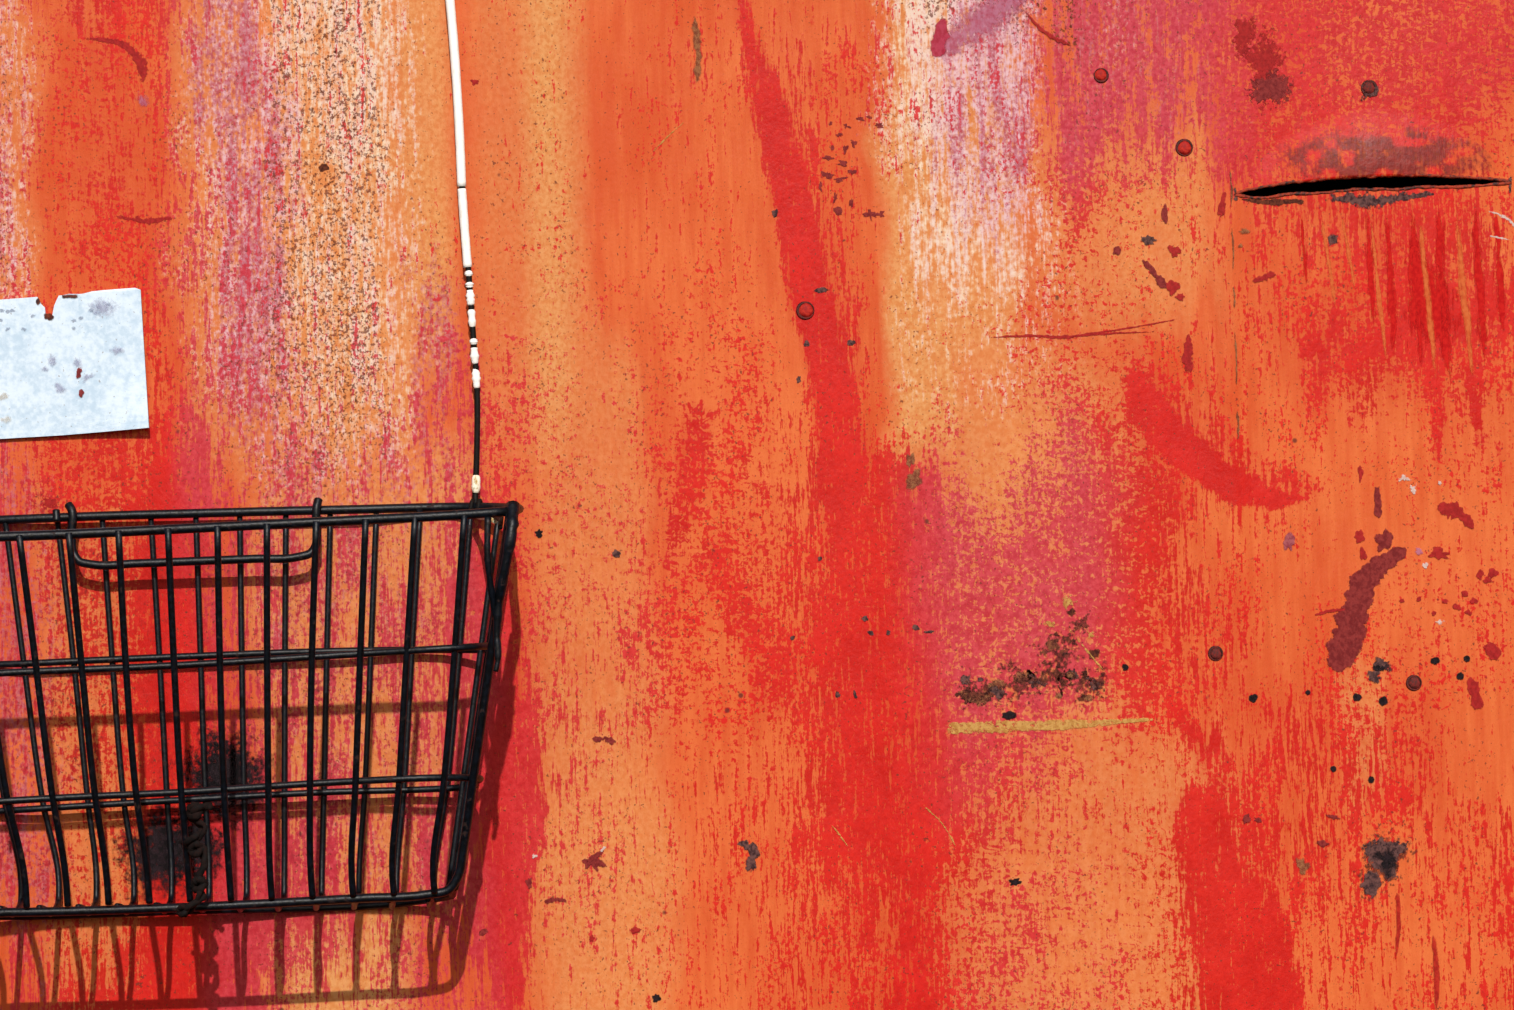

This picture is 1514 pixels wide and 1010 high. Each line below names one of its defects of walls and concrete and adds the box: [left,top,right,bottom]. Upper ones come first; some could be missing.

rust [955,596,1108,710]
rust [1353,828,1417,955]
rust [1432,936,1440,1010]